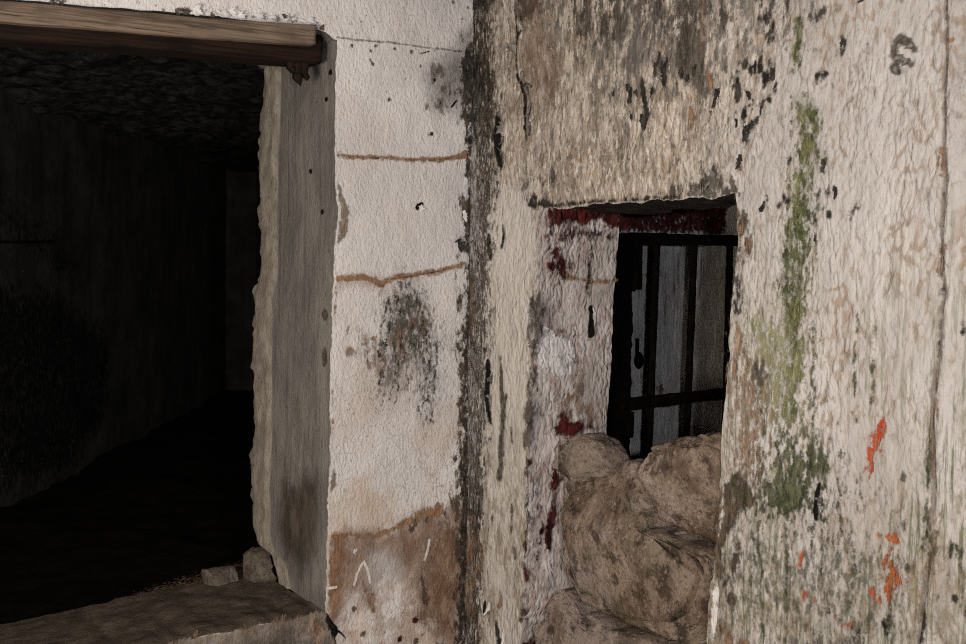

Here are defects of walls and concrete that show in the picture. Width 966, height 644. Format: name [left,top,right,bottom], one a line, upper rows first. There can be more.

leakage [168,0,837,644]
rust [862,417,886,480]
peeling [353,549,396,586]
rust [869,532,906,606]